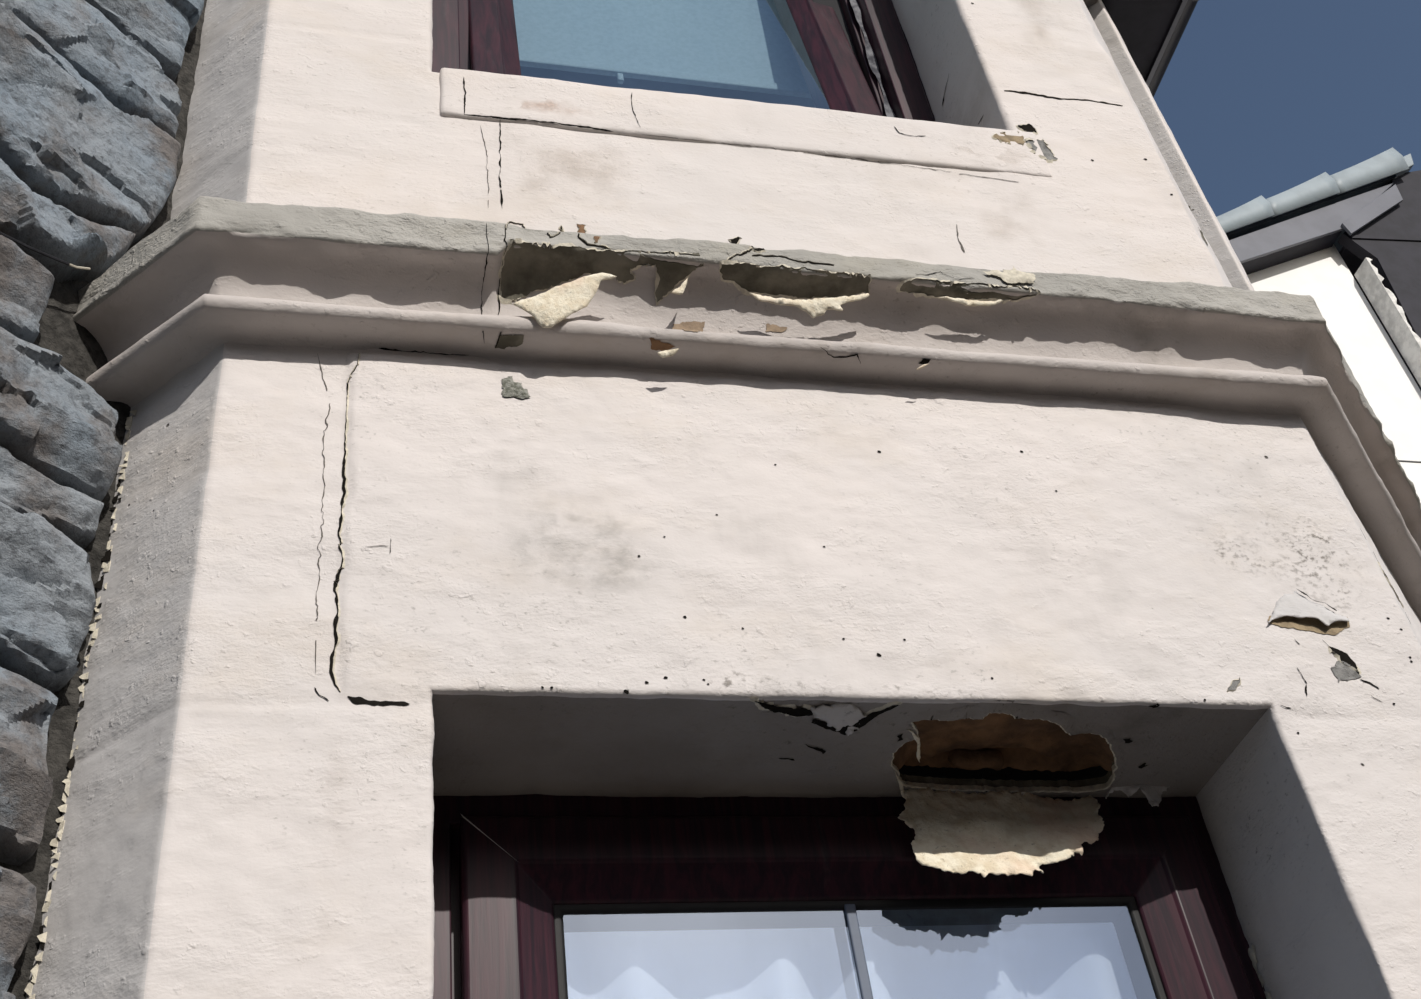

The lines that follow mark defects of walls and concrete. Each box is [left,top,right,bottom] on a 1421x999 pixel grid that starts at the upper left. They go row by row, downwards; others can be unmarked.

spalling [991,124,1058,163]
peeling [496,224,872,328]
peeling [896,266,1041,306]
spalling [495,335,524,349]
peeling [649,337,679,358]
crack [315,78,1017,706]
peeling [1268,589,1379,689]
spalling [750,698,1170,878]